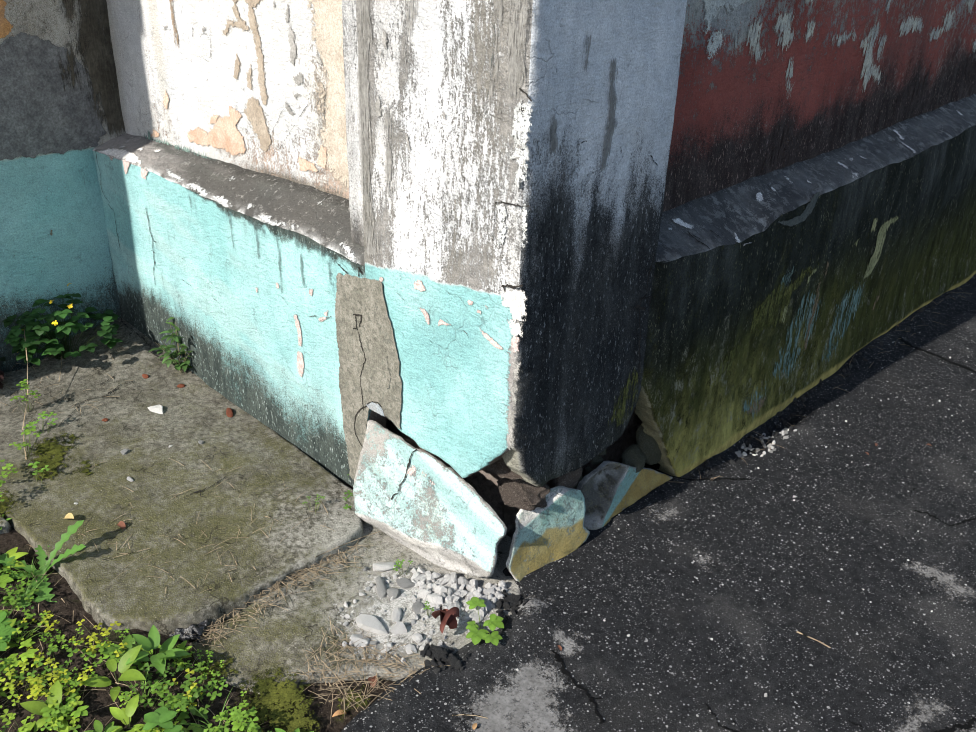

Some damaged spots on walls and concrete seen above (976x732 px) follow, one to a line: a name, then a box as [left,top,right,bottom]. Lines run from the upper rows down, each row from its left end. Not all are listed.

peeling [0,0,13,38]
peeling [700,0,816,99]
peeling [832,21,887,92]
peeling [899,0,975,41]
peeling [99,0,349,193]
flaking render [165,169,232,208]
flaking render [247,203,299,230]
water stain [864,216,898,278]
peeling [419,308,451,326]
water stain [750,262,819,337]
crack [310,314,391,446]
crack [391,449,417,500]